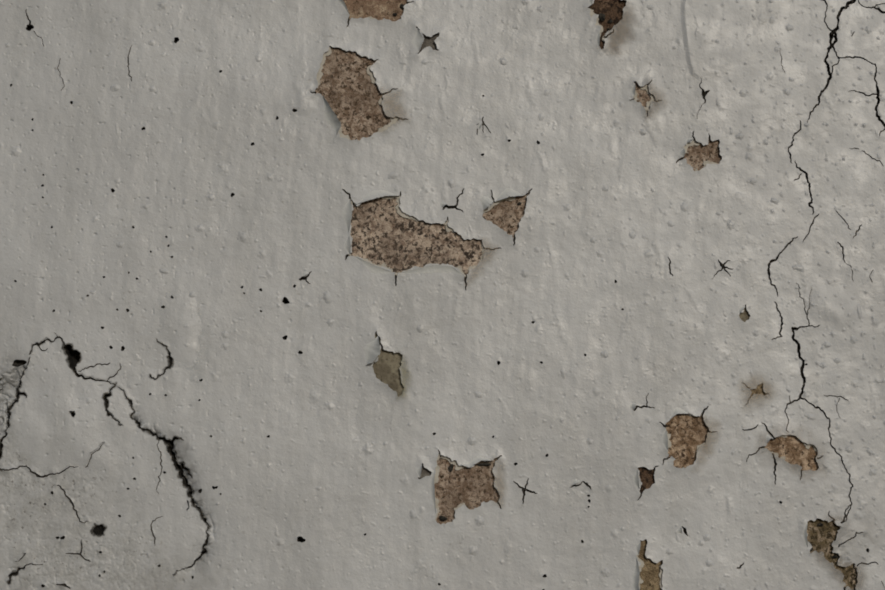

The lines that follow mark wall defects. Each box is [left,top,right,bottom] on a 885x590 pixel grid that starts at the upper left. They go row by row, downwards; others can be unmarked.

peeling [588,0,626,49]
peeling [310,46,408,141]
peeling [342,189,499,290]
peeling [480,188,532,246]
crack [767,0,885,522]
crack [149,339,173,380]
crack [0,333,104,562]
crack [78,363,211,575]
peeling [416,450,502,524]
peeling [633,406,716,501]
crack [7,553,43,584]
peeling [803,505,878,590]